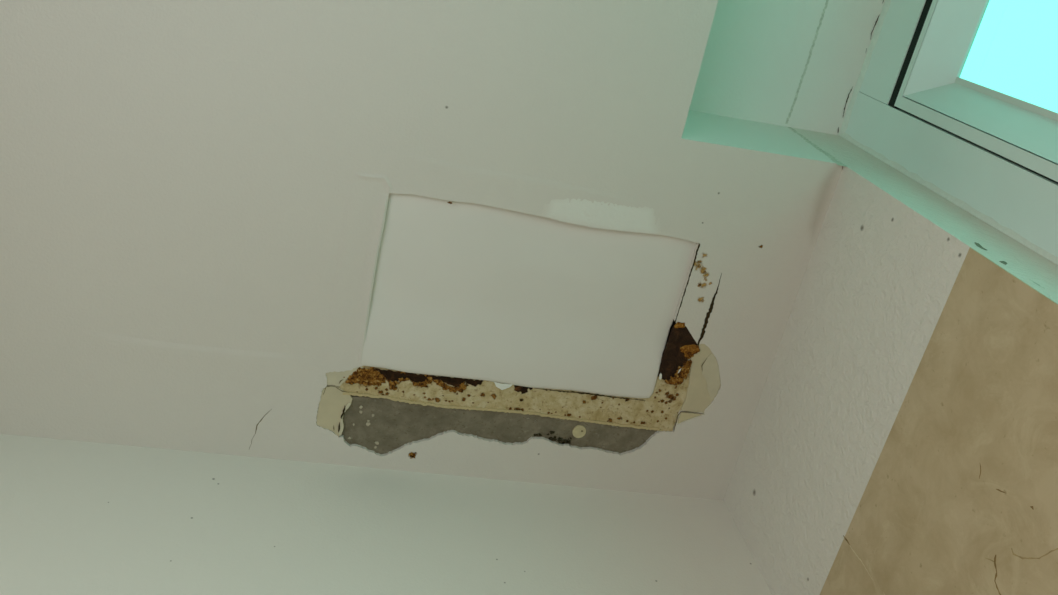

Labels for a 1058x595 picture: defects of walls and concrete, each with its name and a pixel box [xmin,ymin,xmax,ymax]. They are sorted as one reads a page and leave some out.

crack [675,243,700,323]
crack [697,273,722,346]
rust [343,367,496,404]
spalling [316,366,657,454]
rust [509,385,533,411]
rust [539,322,700,424]
peeling [674,344,721,430]
crack [986,548,1058,595]